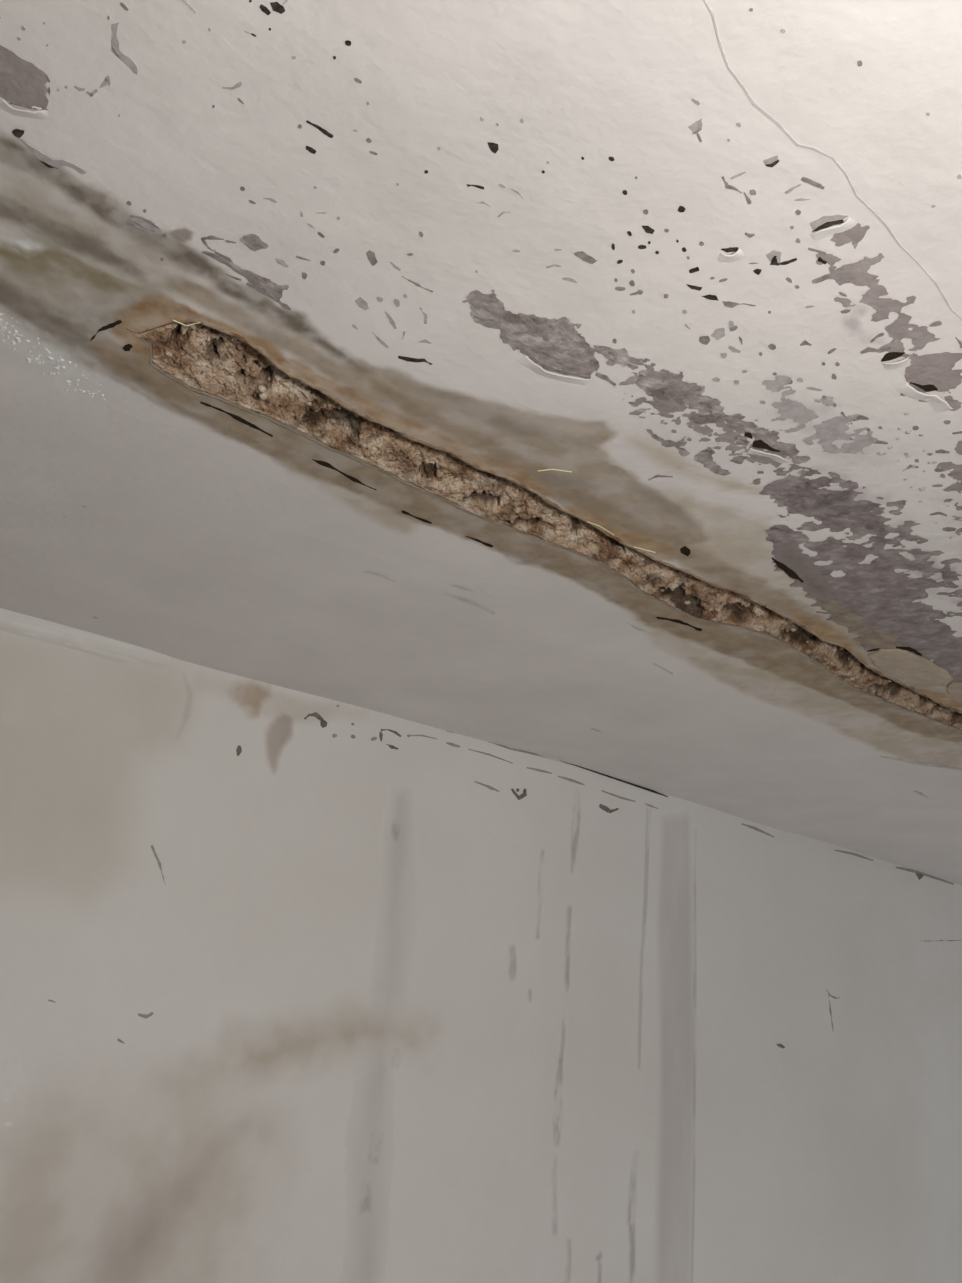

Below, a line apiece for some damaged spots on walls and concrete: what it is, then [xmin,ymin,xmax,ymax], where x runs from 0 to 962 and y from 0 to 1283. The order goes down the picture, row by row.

peeling [0,26,110,174]
peeling [298,120,333,138]
peeling [689,98,702,142]
peeling [763,155,779,167]
crack [703,0,962,320]
peeling [722,172,756,204]
damp [0,125,962,776]
flaking render [90,177,962,732]
flaking render [304,712,410,750]
crack [741,823,775,838]
crack [834,850,954,885]